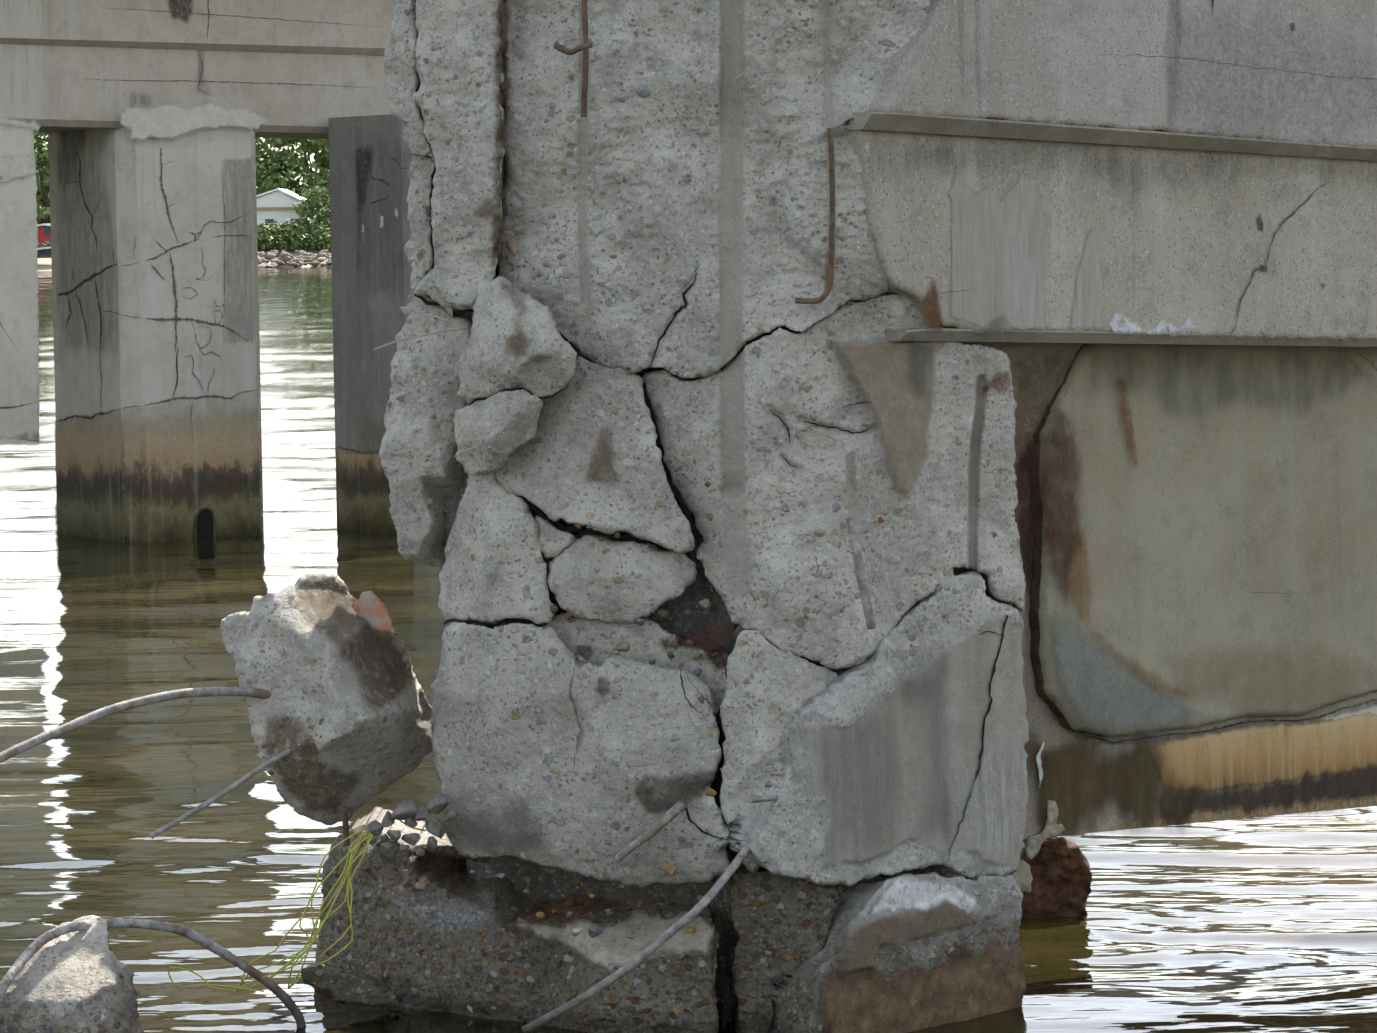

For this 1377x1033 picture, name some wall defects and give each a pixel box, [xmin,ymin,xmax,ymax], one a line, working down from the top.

spalling [553,0,592,117]
crack [0,149,252,421]
spalling [795,128,835,304]
water stain [0,407,263,543]
crack [443,266,874,626]
rust [1017,413,1091,618]
rust [662,622,733,669]
crack [679,665,727,797]
crack [948,615,1008,862]
water stain [1111,816,1166,831]
water stain [1152,712,1377,824]
spalling [522,837,751,1033]